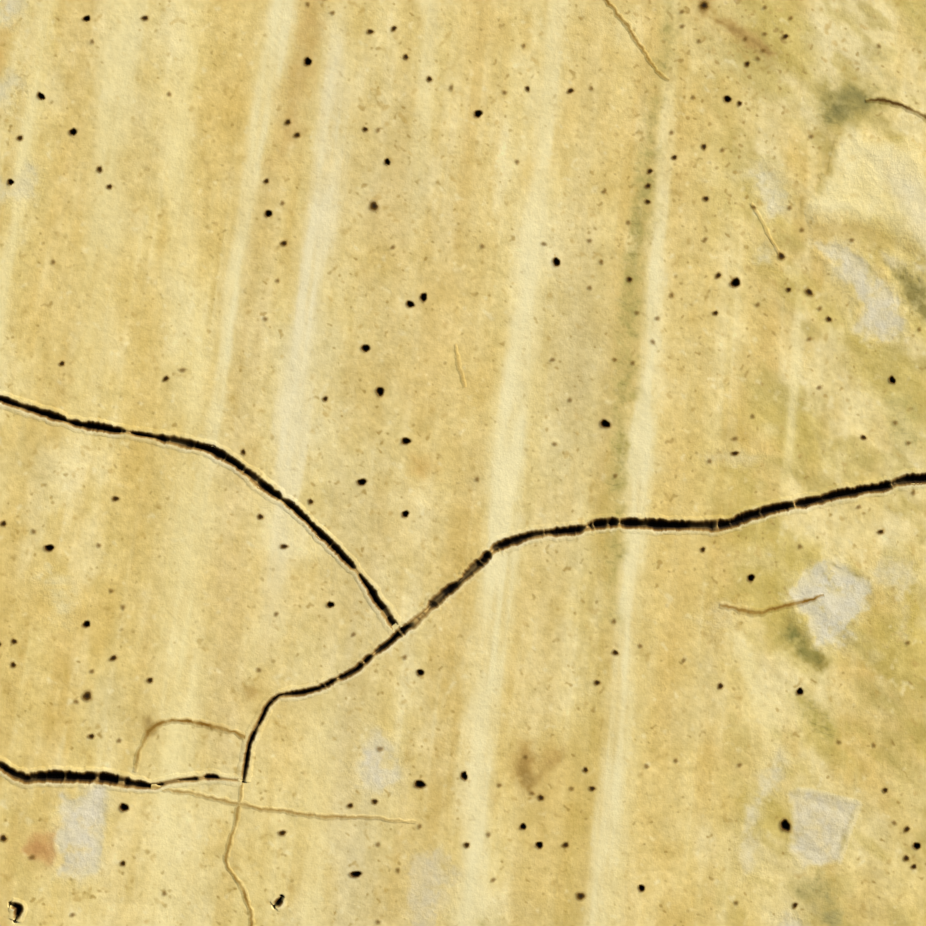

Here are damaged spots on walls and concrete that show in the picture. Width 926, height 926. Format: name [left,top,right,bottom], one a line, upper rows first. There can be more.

crack [602,0,670,82]
crack [865,96,926,123]
crack [0,391,926,926]